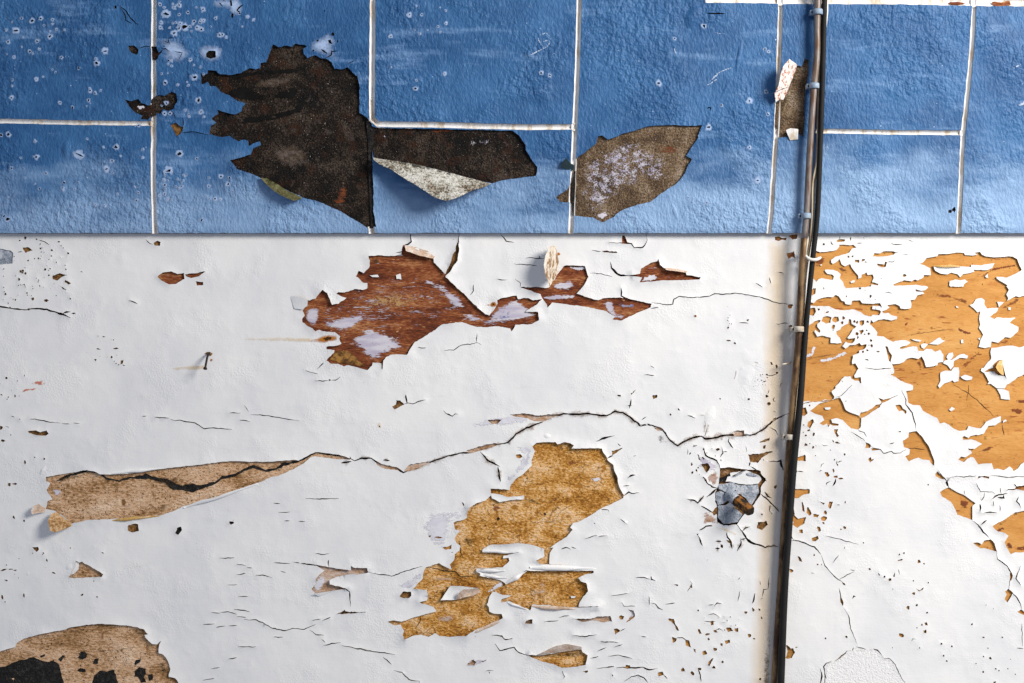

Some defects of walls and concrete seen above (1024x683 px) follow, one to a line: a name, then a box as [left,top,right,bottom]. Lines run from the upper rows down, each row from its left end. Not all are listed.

peeling [126,33,537,228]
peeling [556,125,702,222]
peeling [775,59,808,140]
crack [0,306,75,318]
peeling [290,245,651,370]
peeling [798,237,1024,485]
peeling [0,624,178,683]
peeling [13,452,352,532]
crack [203,553,420,682]
peeling [388,442,667,682]
crack [342,395,904,683]
peeling [890,431,975,521]